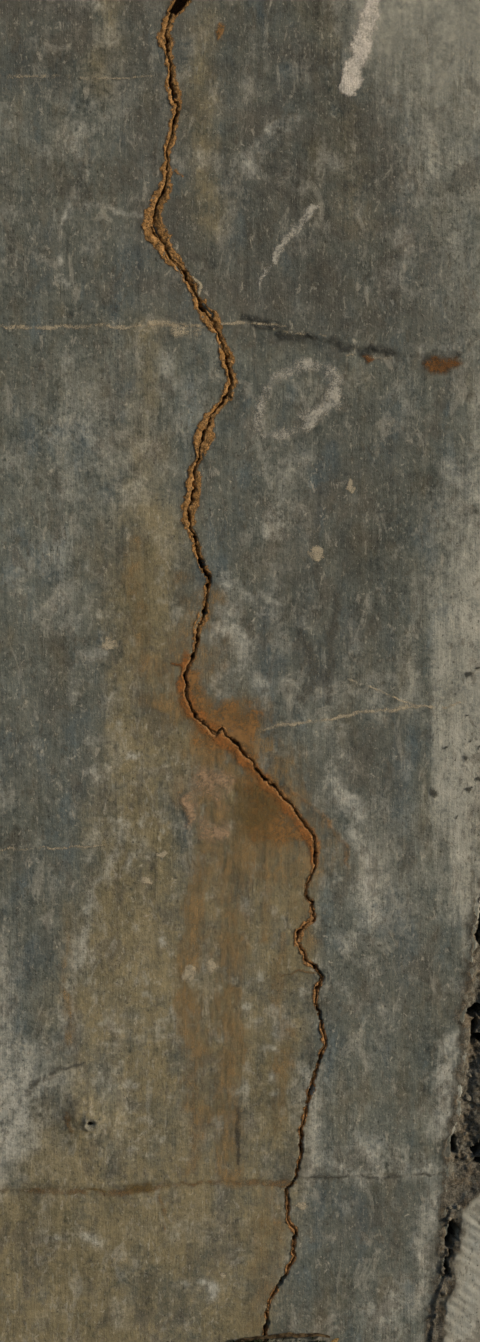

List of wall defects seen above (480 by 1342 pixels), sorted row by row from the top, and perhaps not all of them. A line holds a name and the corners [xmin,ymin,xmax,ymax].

crack [4,0,348,1336]
corrosion [169,594,322,882]
spalling [425,882,480,1342]